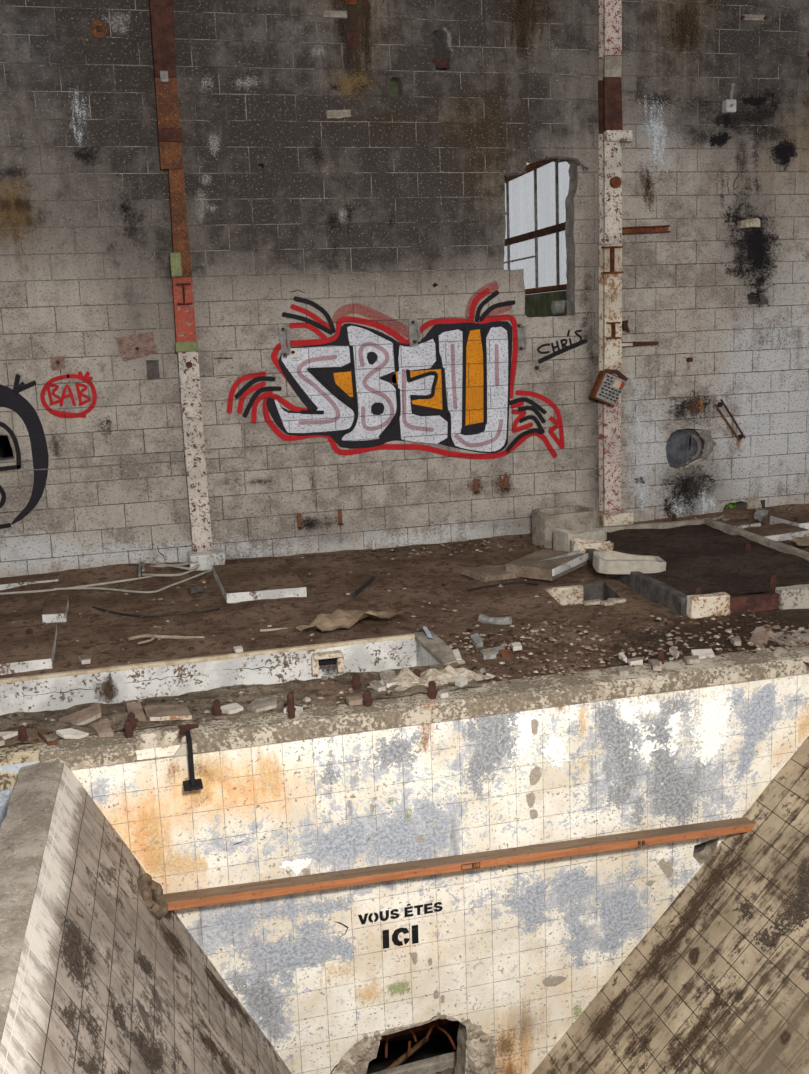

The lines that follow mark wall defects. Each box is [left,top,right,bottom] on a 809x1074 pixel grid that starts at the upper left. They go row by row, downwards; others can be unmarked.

water stain [332,0,371,85]
spalling [680,429,716,471]
water stain [664,480,688,517]
spalling [331,990,502,1074]